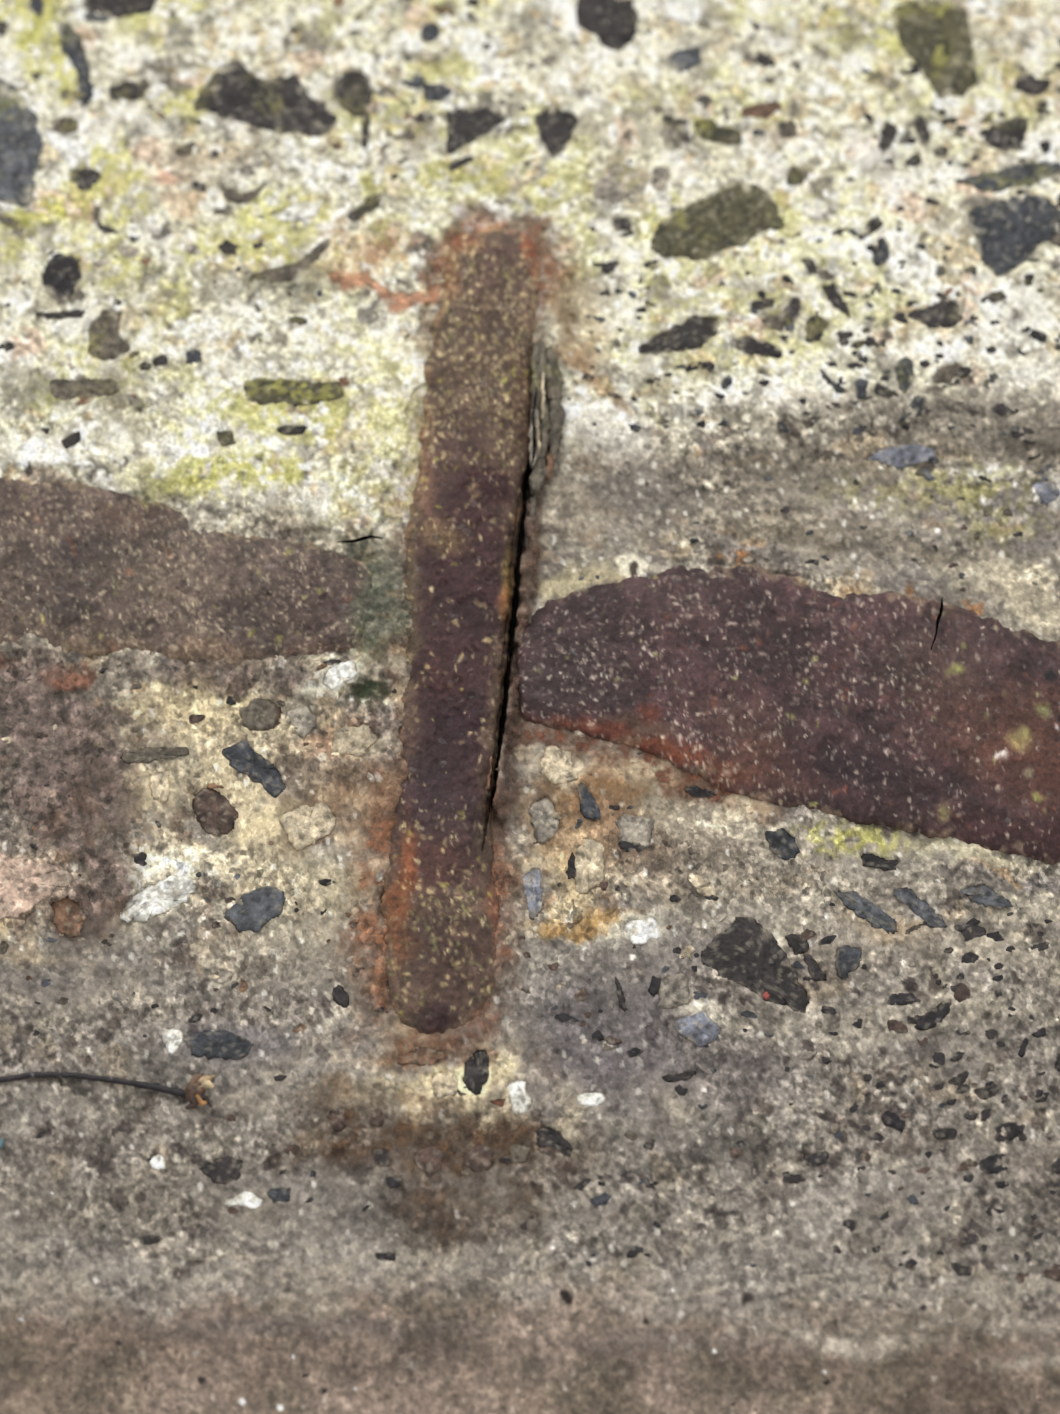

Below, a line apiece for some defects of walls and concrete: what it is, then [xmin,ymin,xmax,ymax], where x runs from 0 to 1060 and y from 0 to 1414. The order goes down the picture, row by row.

corrosion [331,216,572,339]
crack [482,387,537,847]
corrosion [485,499,732,901]
corrosion [357,794,401,896]
corrosion [352,910,394,1010]